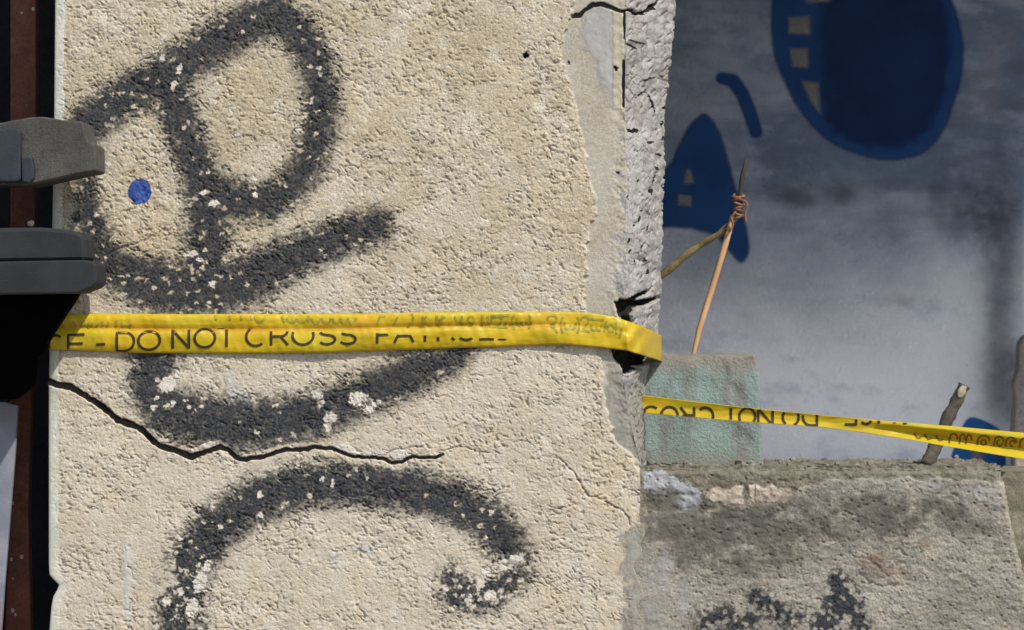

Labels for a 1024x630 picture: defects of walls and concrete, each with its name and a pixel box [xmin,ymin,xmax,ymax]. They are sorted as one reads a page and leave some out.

crack [572,0,663,112]
crack [46,379,475,472]